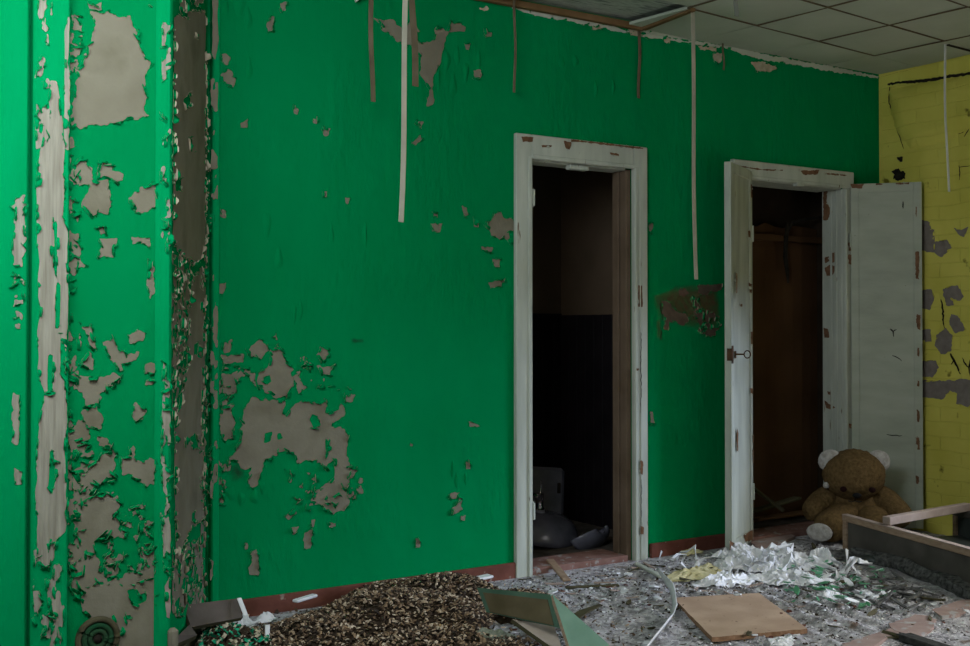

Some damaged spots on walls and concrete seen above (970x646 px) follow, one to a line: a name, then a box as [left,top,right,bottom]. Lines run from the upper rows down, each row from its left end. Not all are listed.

peeling [374,18,471,106]
peeling [510,7,879,79]
peeling [462,206,514,289]
peeling [915,207,952,279]
peeling [9,0,363,646]
peeling [661,284,723,337]
peeling [916,285,970,407]
crack [950,353,970,374]
peeling [449,492,466,521]